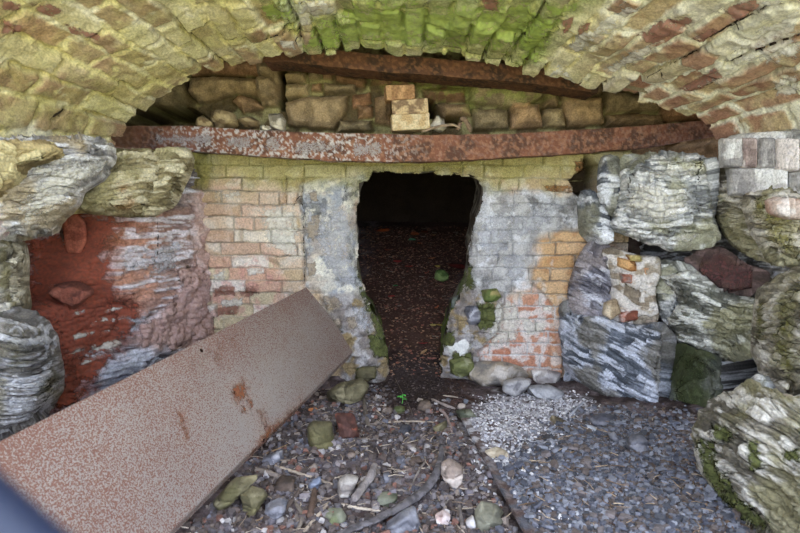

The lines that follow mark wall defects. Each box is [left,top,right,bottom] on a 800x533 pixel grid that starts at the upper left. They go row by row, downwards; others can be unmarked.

leakage [261,0,341,51]